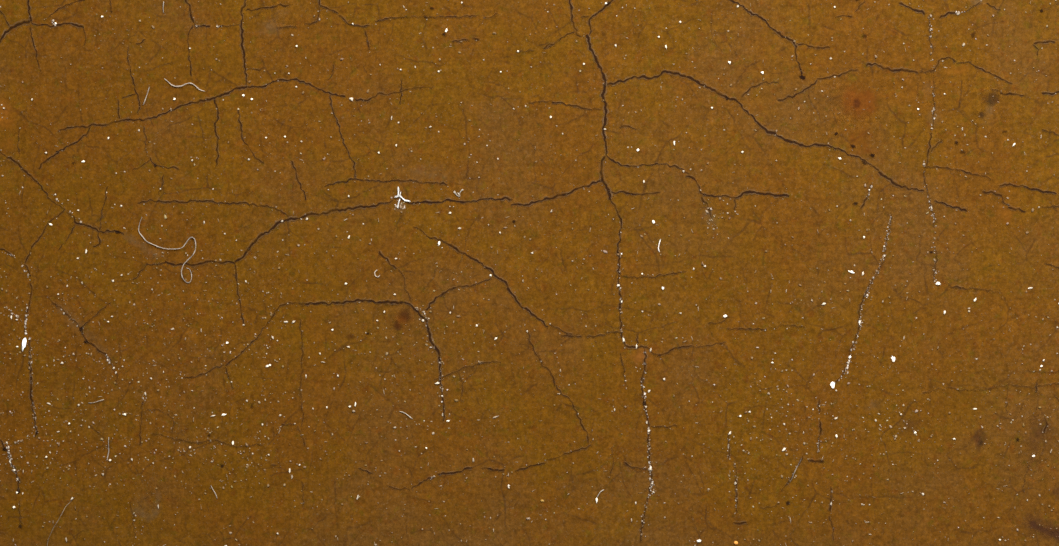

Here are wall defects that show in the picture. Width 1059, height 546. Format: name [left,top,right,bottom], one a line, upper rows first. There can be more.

crack [0,0,448,528]
crack [305,0,1024,536]
crack [983,183,1058,212]